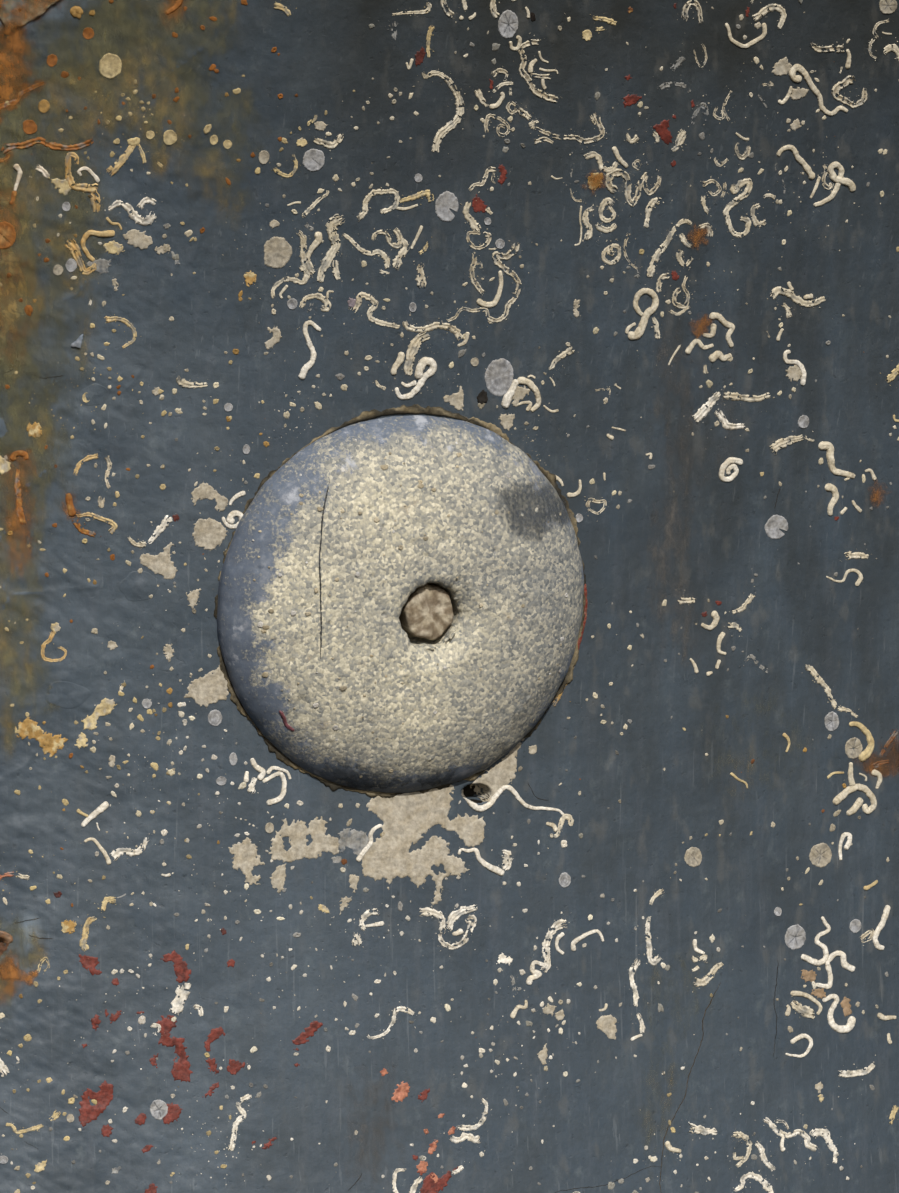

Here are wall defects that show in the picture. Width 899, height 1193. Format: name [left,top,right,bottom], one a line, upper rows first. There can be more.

peeling [0,0,59,35]
rust [0,0,53,546]
spalling [462,783,490,803]
spalling [0,931,13,957]